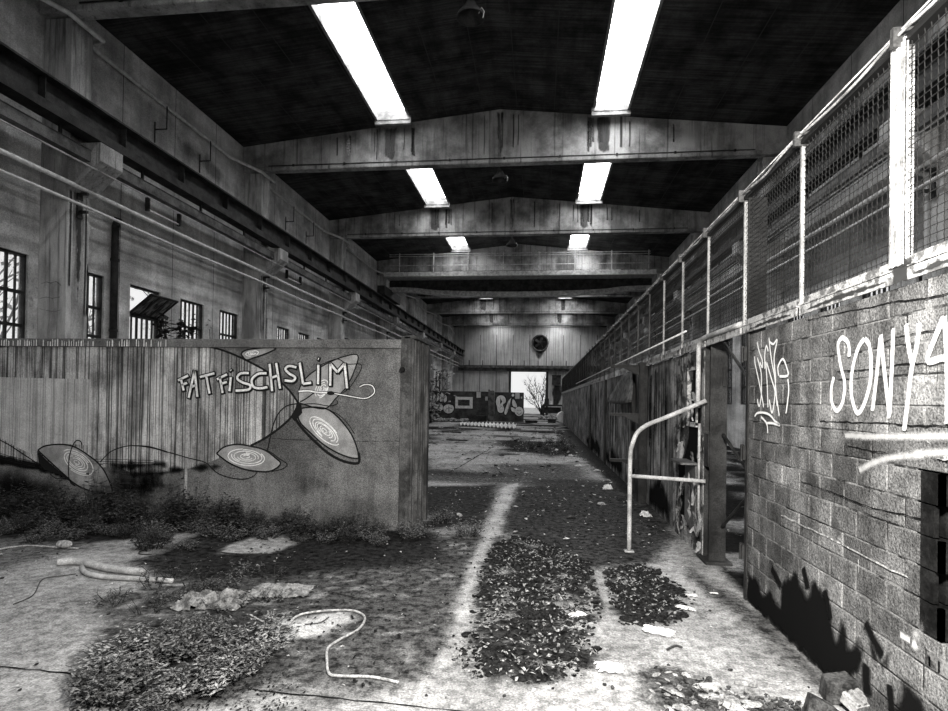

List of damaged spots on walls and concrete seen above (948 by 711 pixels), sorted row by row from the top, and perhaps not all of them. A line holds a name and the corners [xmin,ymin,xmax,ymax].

leakage [374,128,415,160]
leakage [497,112,519,153]
leakage [431,209,452,230]
leakage [573,204,592,228]